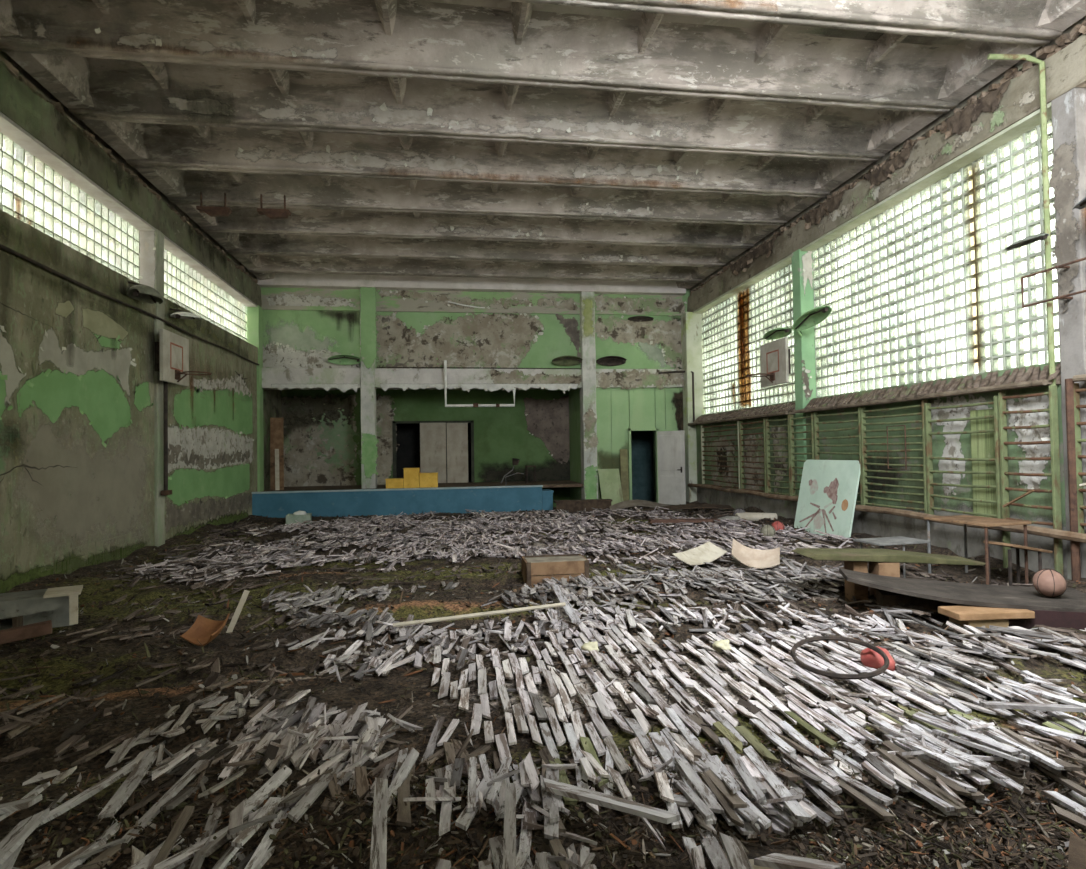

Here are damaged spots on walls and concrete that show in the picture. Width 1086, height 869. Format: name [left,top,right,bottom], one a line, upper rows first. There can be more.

peeling [802,251,814,294]
spalling [1049,136,1081,313]
peeling [0,325,153,448]
peeling [165,374,254,534]
spalling [263,287,582,487]
spalling [583,409,599,451]
peeling [584,465,598,499]
spalling [595,315,684,390]
rust [732,287,752,409]
spalling [931,394,993,502]
spalling [1006,393,1051,494]